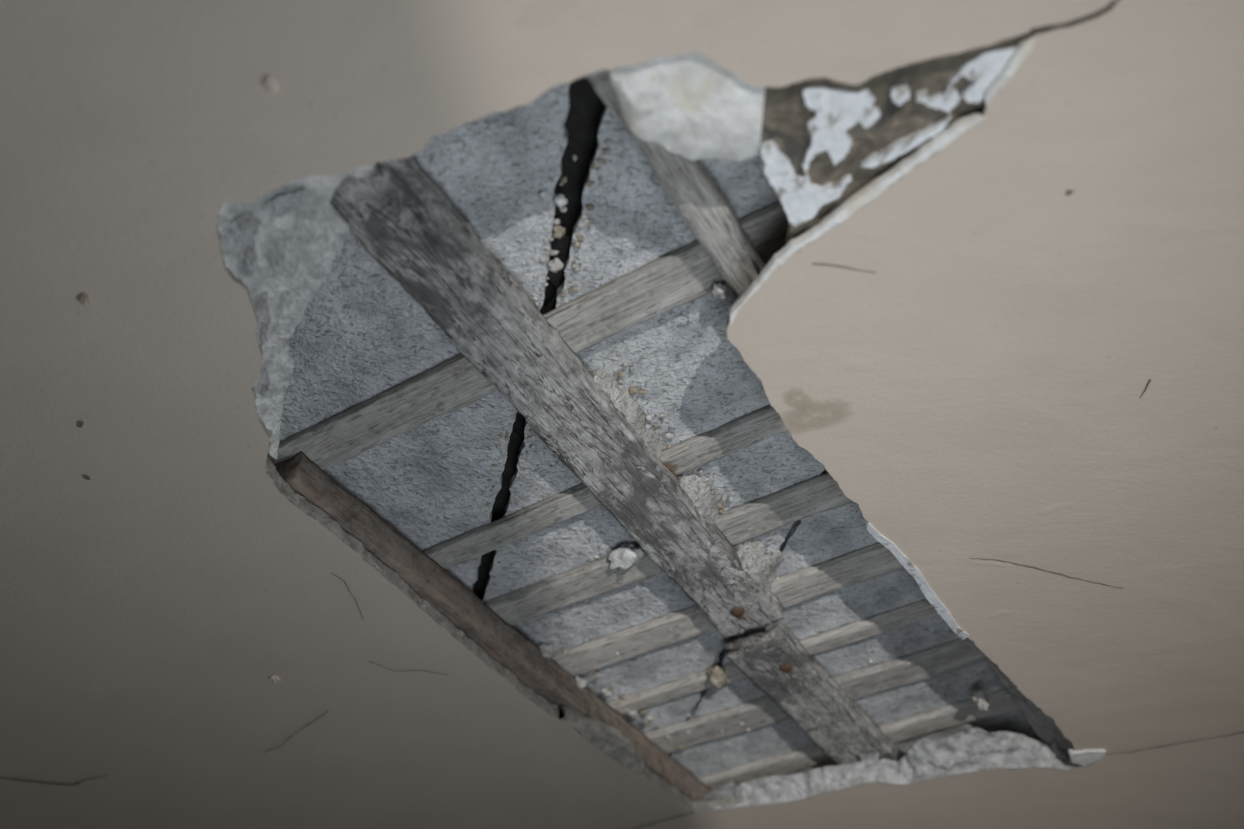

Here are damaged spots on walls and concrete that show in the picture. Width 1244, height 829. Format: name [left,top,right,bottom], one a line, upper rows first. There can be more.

crack [1030,0,1133,36]
spalling [608,32,1035,326]
spalling [218,162,377,460]
spalling [865,519,969,639]
crack [969,558,1122,588]
crack [0,775,108,786]
spalling [559,705,645,775]
spalling [702,727,1106,811]